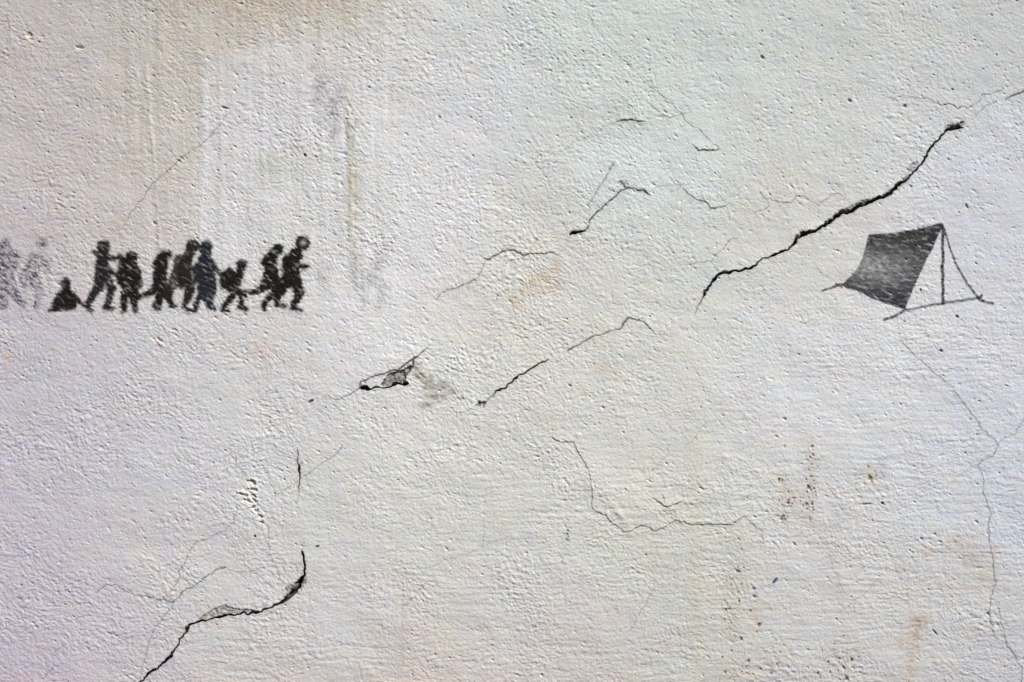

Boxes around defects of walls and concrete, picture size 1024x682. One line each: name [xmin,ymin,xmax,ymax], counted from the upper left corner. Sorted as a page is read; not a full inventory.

crack [435,88,1024,314]
spalling [307,346,429,404]
crack [485,315,668,404]
crack [227,444,344,506]
crack [71,508,312,682]